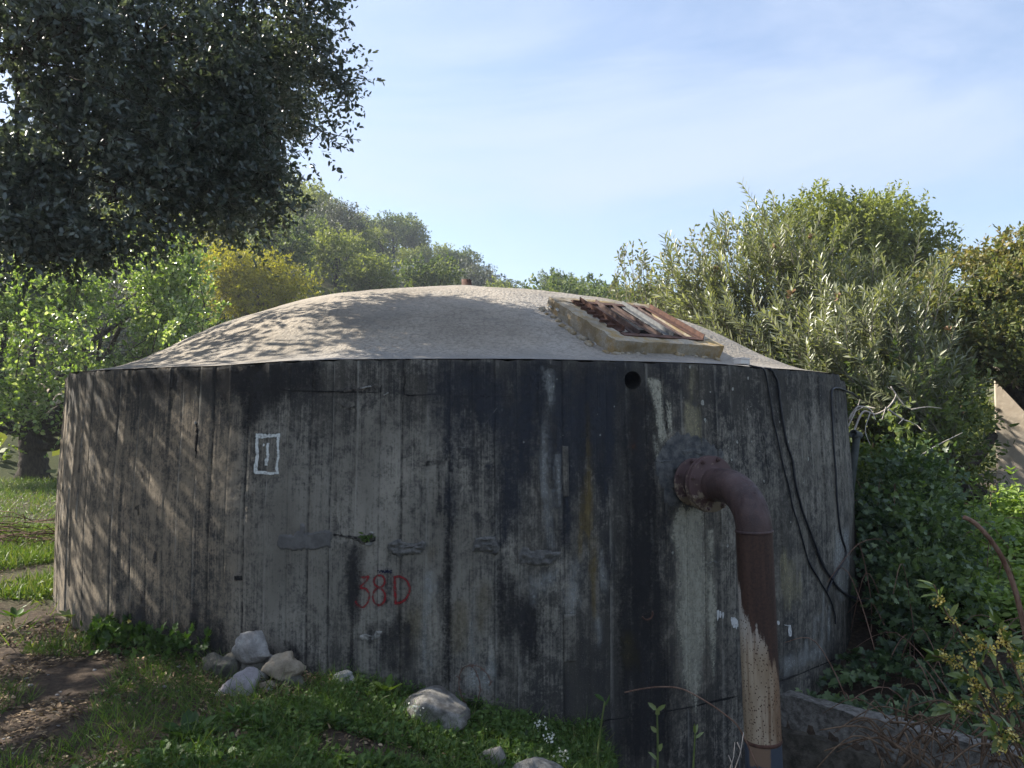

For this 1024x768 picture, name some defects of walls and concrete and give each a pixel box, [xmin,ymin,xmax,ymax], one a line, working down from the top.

water stain [426,362,738,761]